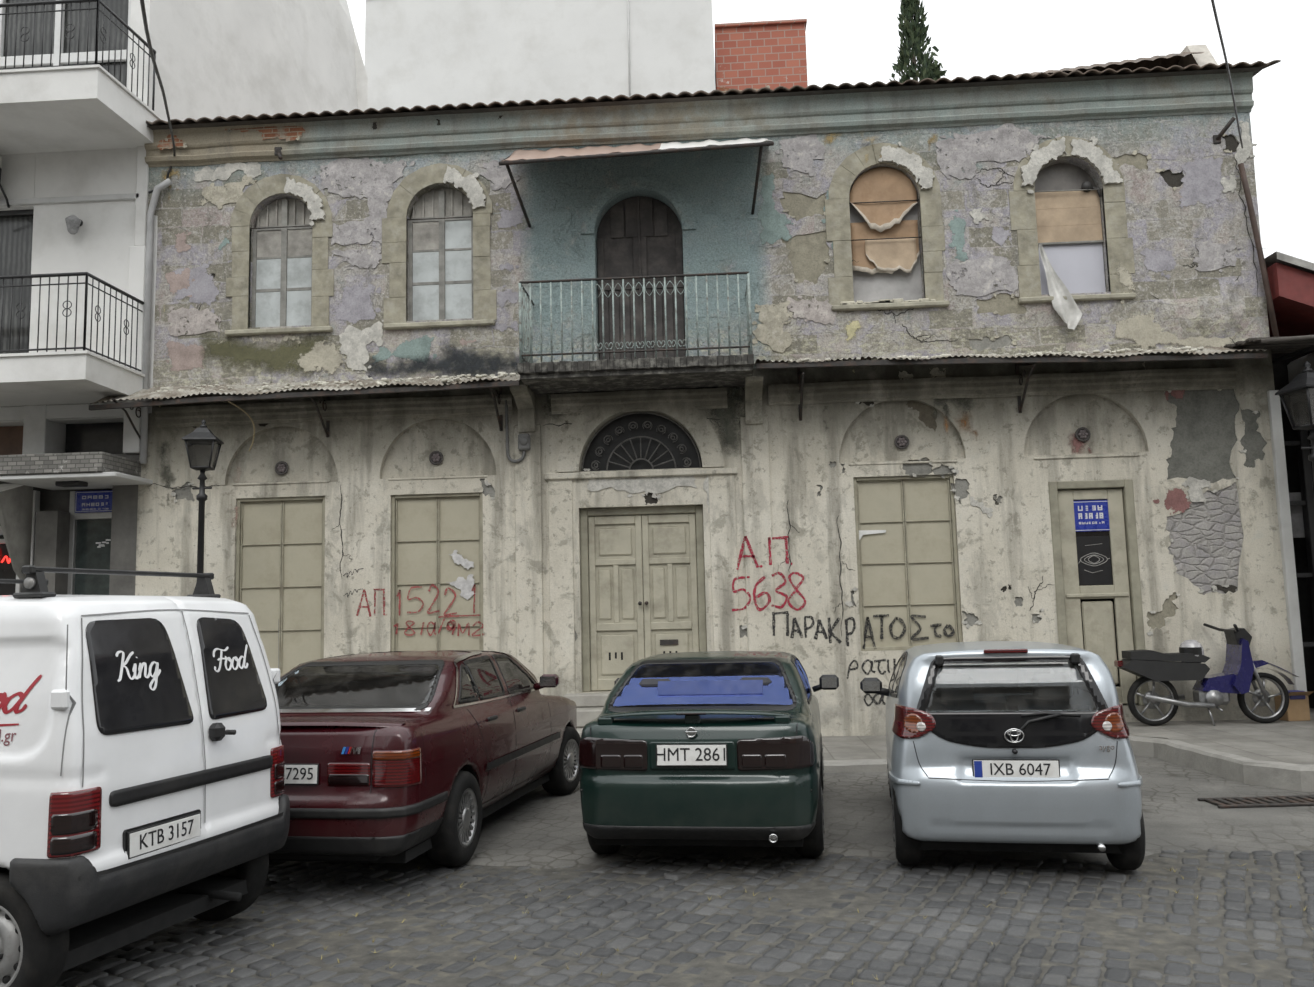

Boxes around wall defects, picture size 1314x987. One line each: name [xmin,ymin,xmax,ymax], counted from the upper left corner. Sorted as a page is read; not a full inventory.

peeling [183,162,261,210]
peeling [775,134,826,177]
crack [977,168,1015,188]
peeling [878,123,1184,194]
peeling [1221,121,1257,193]
peeling [167,231,229,337]
flaking render [752,189,837,353]
peeling [1193,239,1242,287]
water stain [367,347,530,389]
flaking render [1153,389,1267,595]
crack [835,515,855,636]
flaking render [1146,592,1180,636]